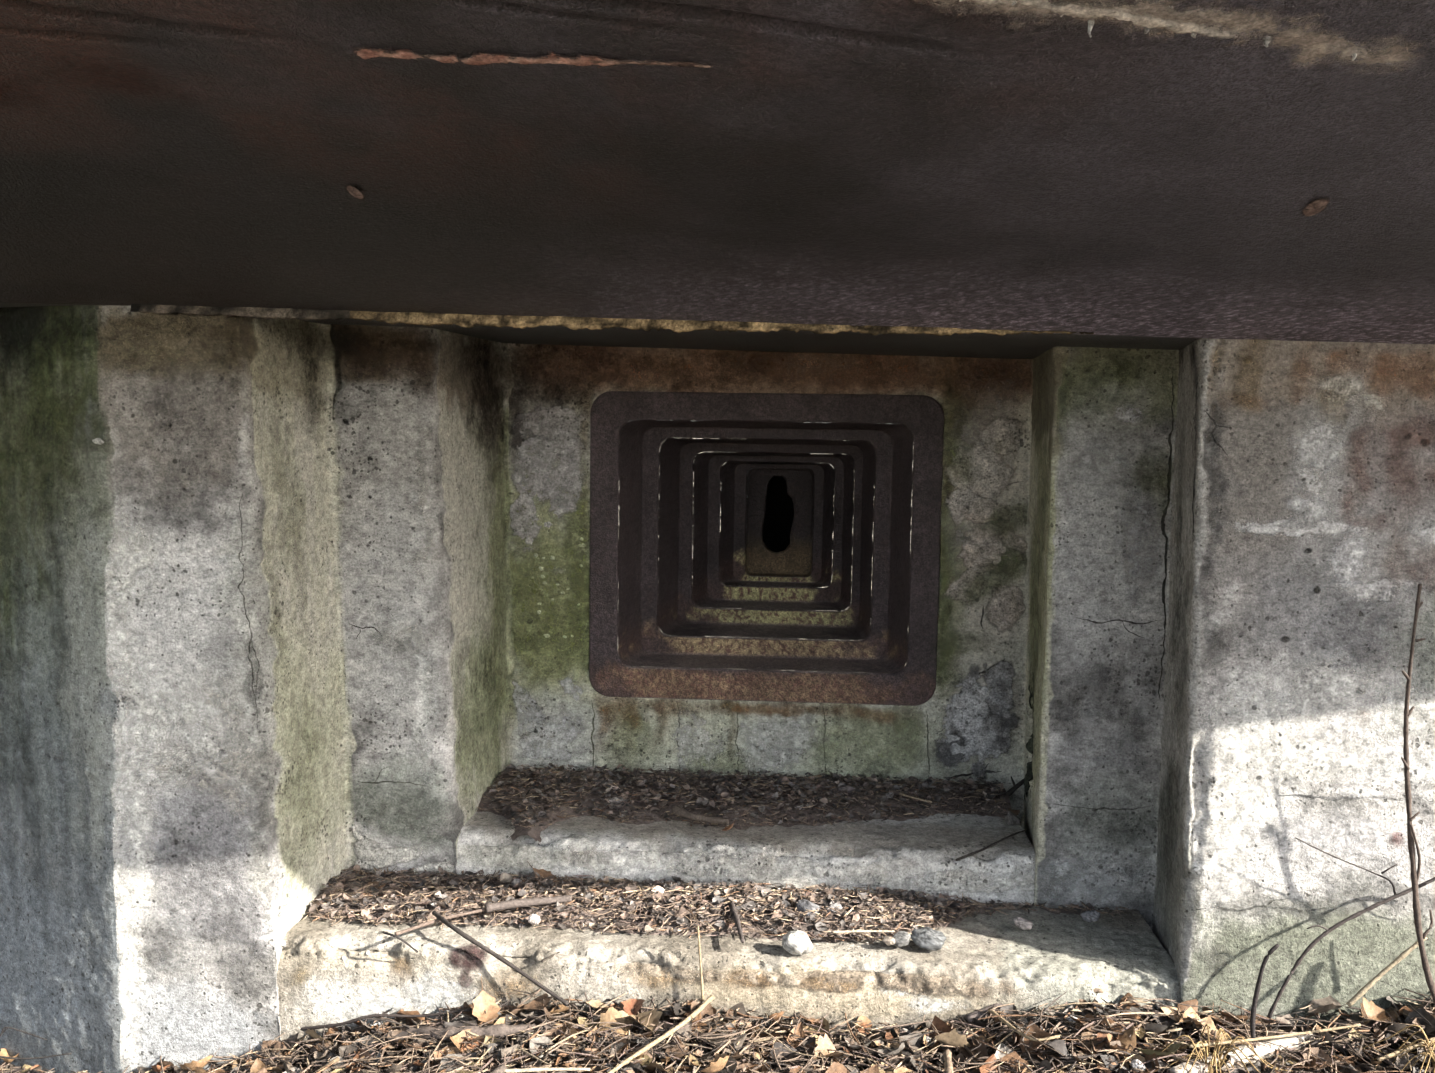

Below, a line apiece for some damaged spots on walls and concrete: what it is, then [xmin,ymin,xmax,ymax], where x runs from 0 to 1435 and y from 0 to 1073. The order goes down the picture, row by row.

water stain [933,0,1411,63]
crack [237,493,260,732]
crack [1076,363,1229,699]